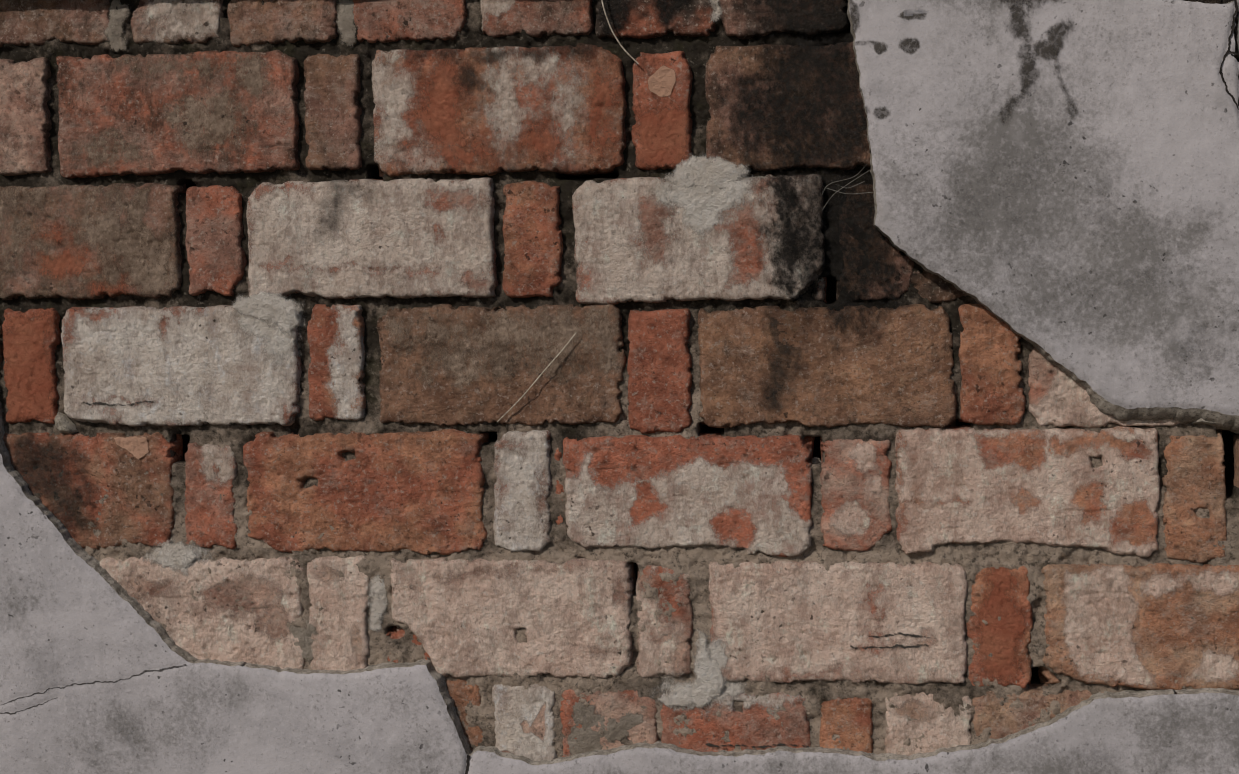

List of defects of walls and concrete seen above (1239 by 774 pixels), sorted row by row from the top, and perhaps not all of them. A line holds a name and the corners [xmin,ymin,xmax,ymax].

peeling [145,0,223,43]
peeling [480,0,514,29]
peeling [485,47,590,159]
leakage [1000,0,1076,123]
crack [1219,0,1239,110]
peeling [246,50,496,421]
peeling [572,65,825,305]
peeling [847,0,1239,557]
peeling [0,305,1239,765]
crack [0,664,186,715]